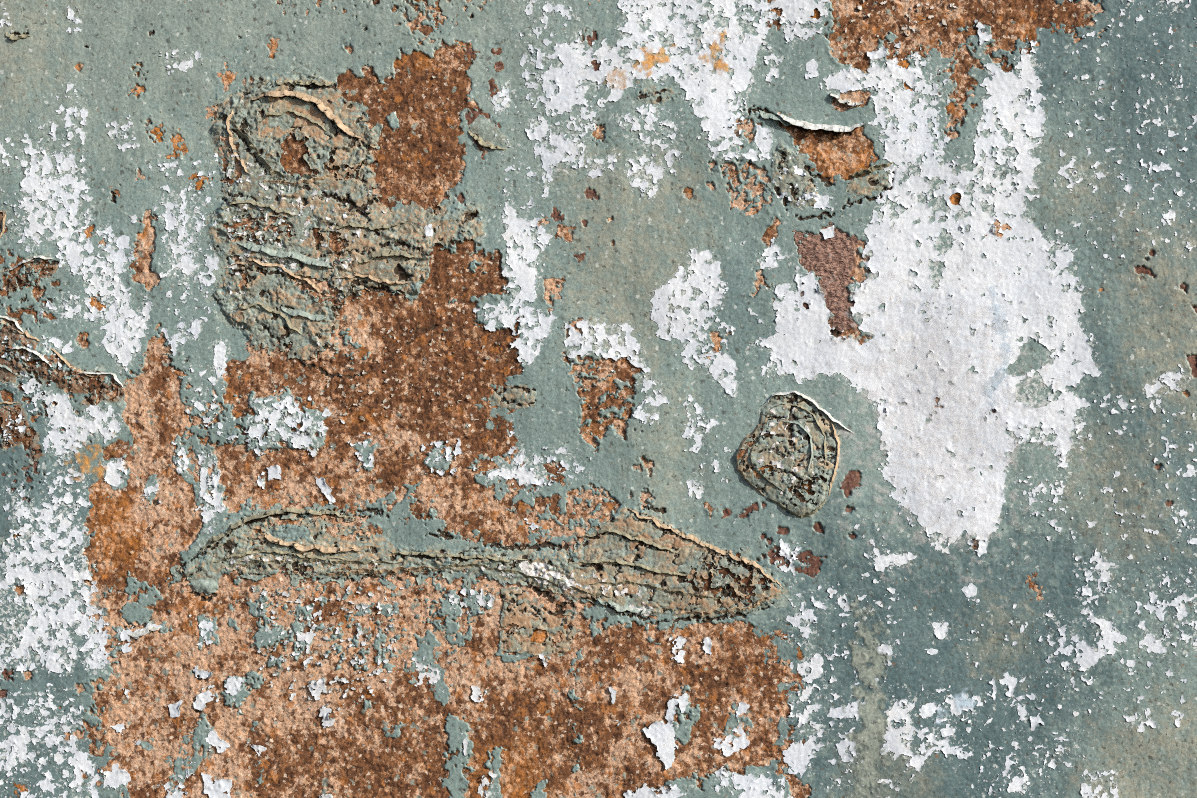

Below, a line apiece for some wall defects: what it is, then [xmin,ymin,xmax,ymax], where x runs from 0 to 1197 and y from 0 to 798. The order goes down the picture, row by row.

peeling [0,83,386,377]
rust [276,0,504,213]
peeling [473,0,835,499]
rust [683,116,872,345]
rust [775,90,879,183]
rust [810,0,1105,142]
peeling [0,335,163,798]
rust [0,228,826,798]
rust [788,470,861,513]
peeling [713,0,1197,798]
peeling [157,761,232,798]
peeling [168,665,244,718]